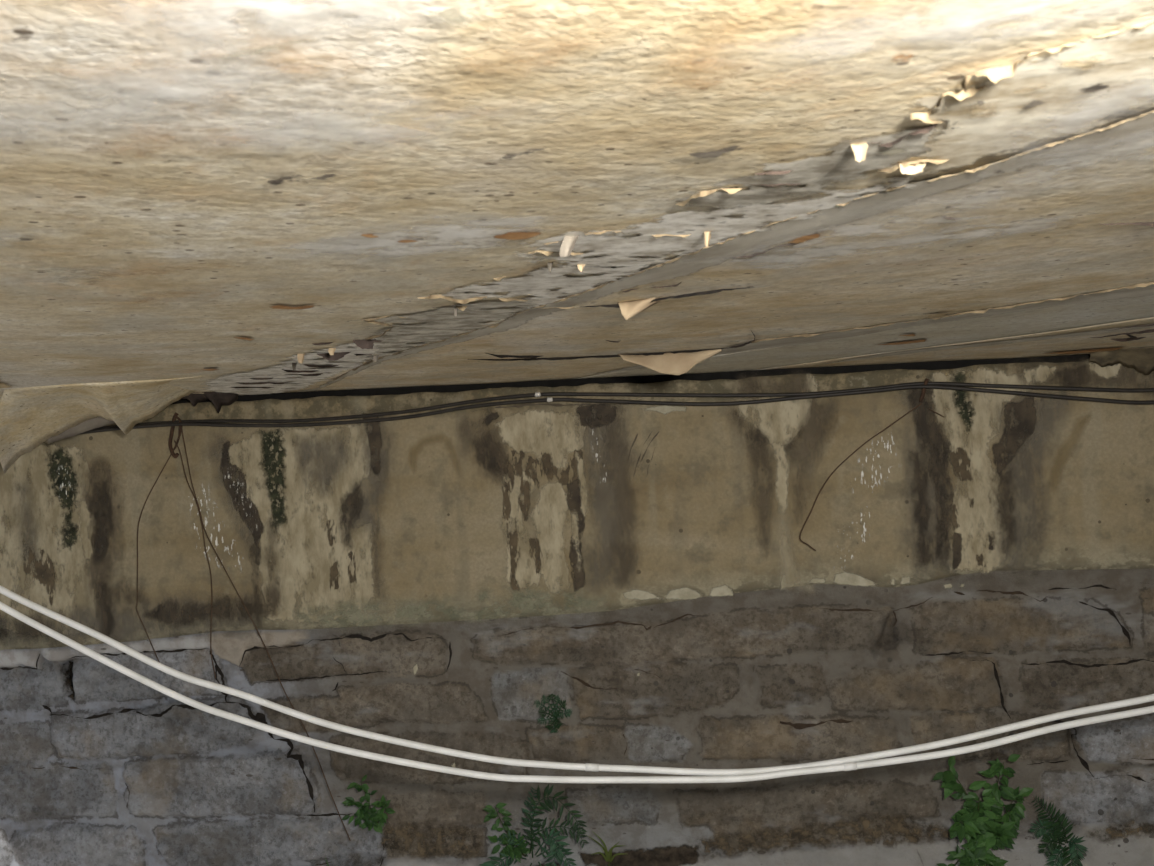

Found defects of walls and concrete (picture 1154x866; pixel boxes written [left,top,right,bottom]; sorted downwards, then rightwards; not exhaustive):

peeling [0,19,1154,473]
crack [1090,324,1154,342]
damp [0,404,634,642]
damp [738,375,831,585]
damp [909,361,1154,573]